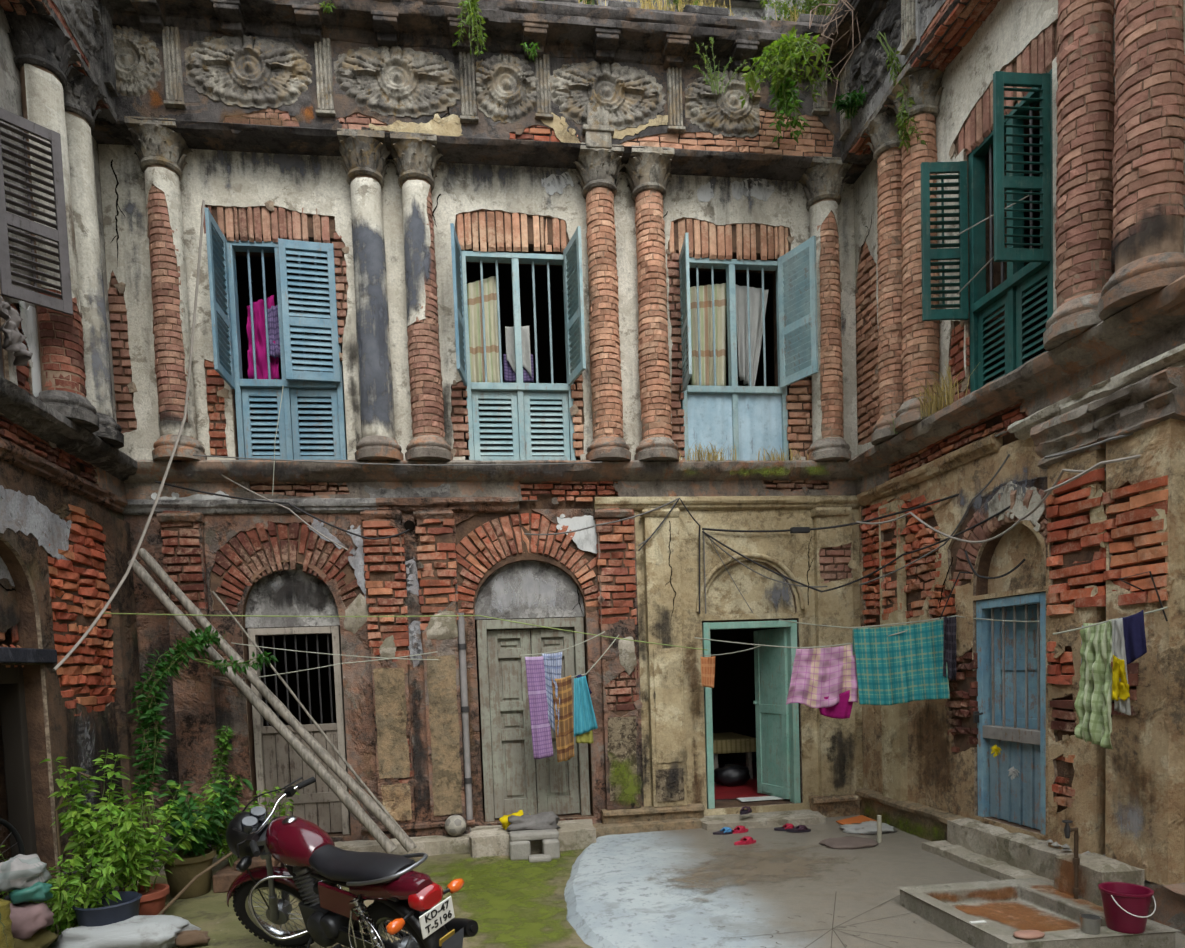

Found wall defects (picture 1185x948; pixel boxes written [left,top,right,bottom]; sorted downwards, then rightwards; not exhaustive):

crack [110,160,126,265]
spalling [106,271,138,434]
spalling [146,186,189,422]
leakage [348,221,394,443]
spalling [407,180,470,457]
spalling [635,189,794,460]
spalling [611,108,834,157]
spalling [786,81,1032,460]
spalling [1002,0,1185,308]
spalling [0,485,117,716]
spalling [151,481,637,667]
spalling [819,467,1176,628]